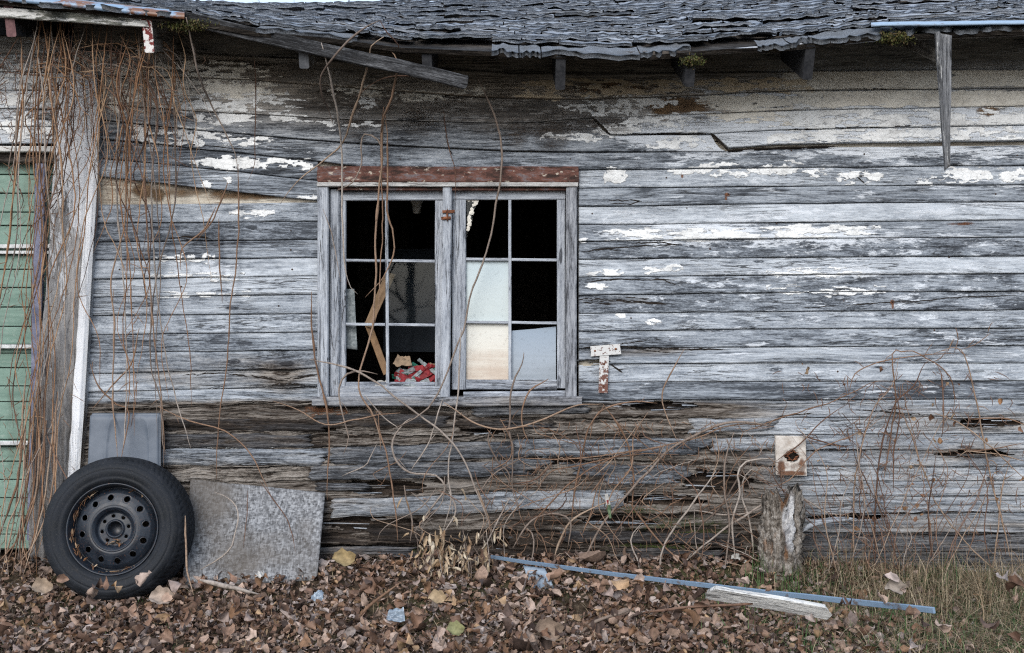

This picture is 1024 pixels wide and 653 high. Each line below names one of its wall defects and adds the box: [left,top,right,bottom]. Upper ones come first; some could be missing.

peeling [0,51,486,188]
crack [592,116,910,152]
peeling [603,166,629,184]
peeling [916,166,1024,186]
water stain [132,184,276,200]
peeling [602,223,881,242]
corrosion [778,450,805,475]